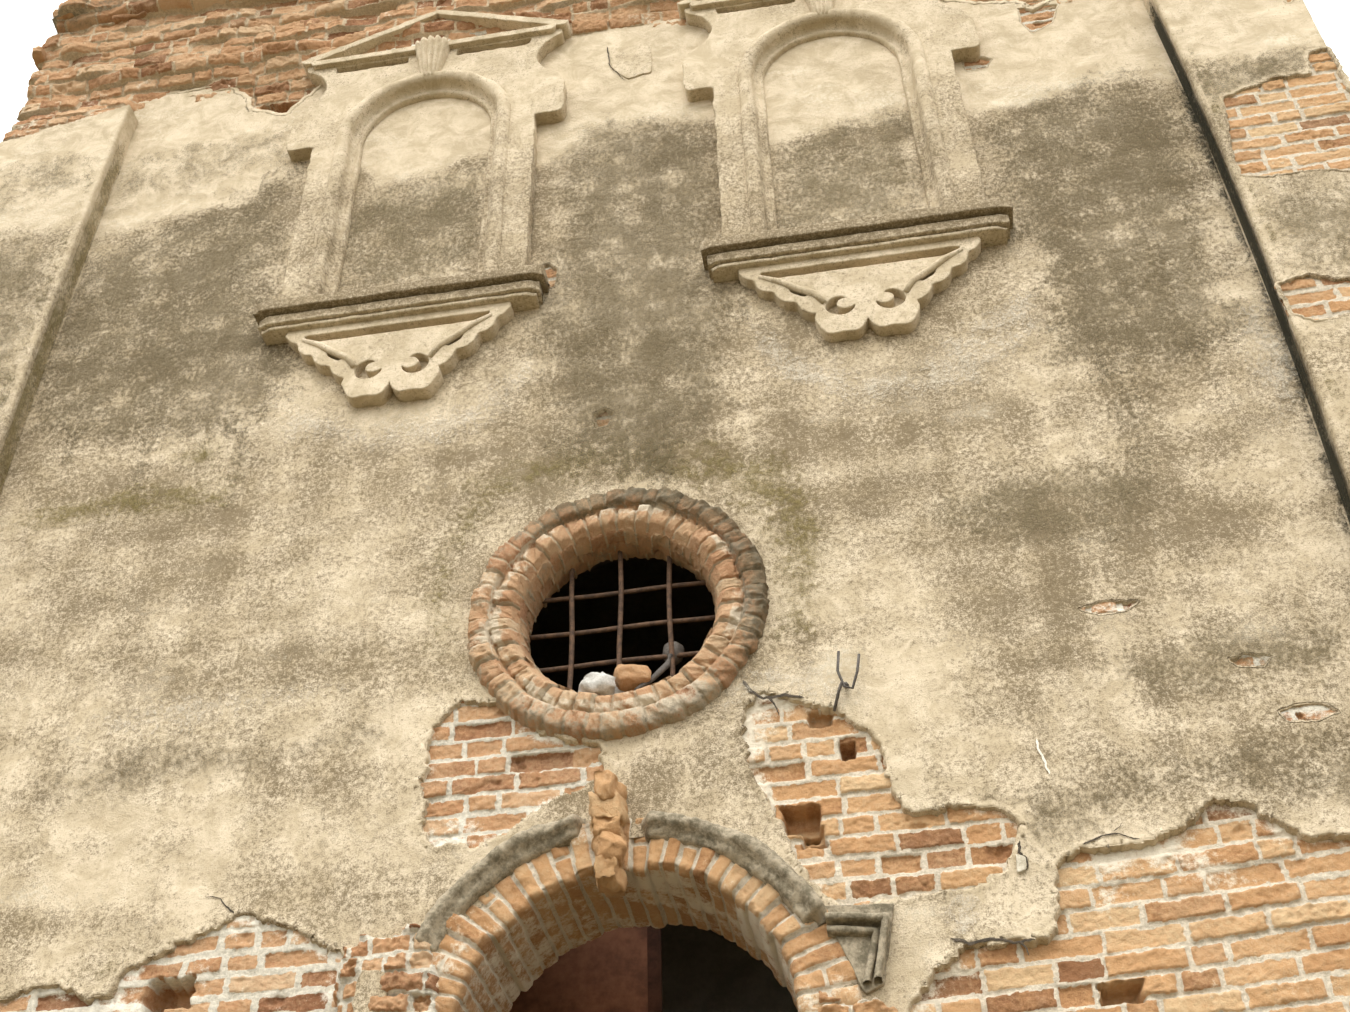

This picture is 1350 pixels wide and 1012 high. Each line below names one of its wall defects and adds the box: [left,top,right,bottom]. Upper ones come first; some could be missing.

flaking render [1220,46,1350,178]
water stain [39,171,297,488]
water stain [534,117,748,487]
water stain [992,2,1350,529]
flaking render [1274,271,1350,323]
flaking render [0,907,347,1012]
water stain [412,814,586,952]
flaking render [412,694,611,855]
water stain [641,810,827,926]
flaking render [733,685,1027,906]
water stain [1027,765,1146,837]
flaking render [901,792,1350,1012]